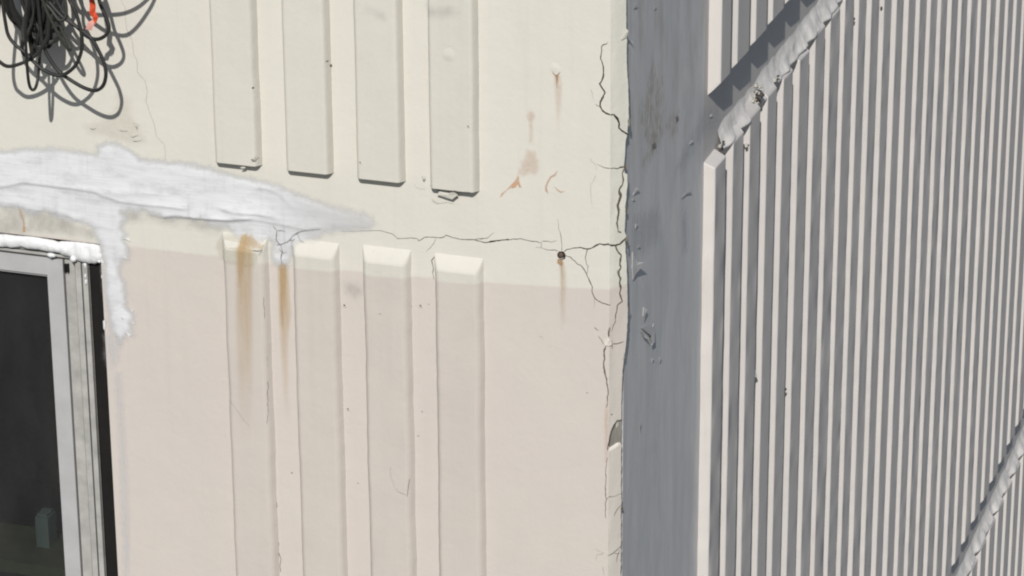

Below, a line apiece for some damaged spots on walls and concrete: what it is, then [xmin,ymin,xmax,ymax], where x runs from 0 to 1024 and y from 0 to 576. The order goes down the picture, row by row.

crack [591,43,629,135]
crack [352,159,626,407]
spalling [607,420,622,450]
crack [605,458,619,517]